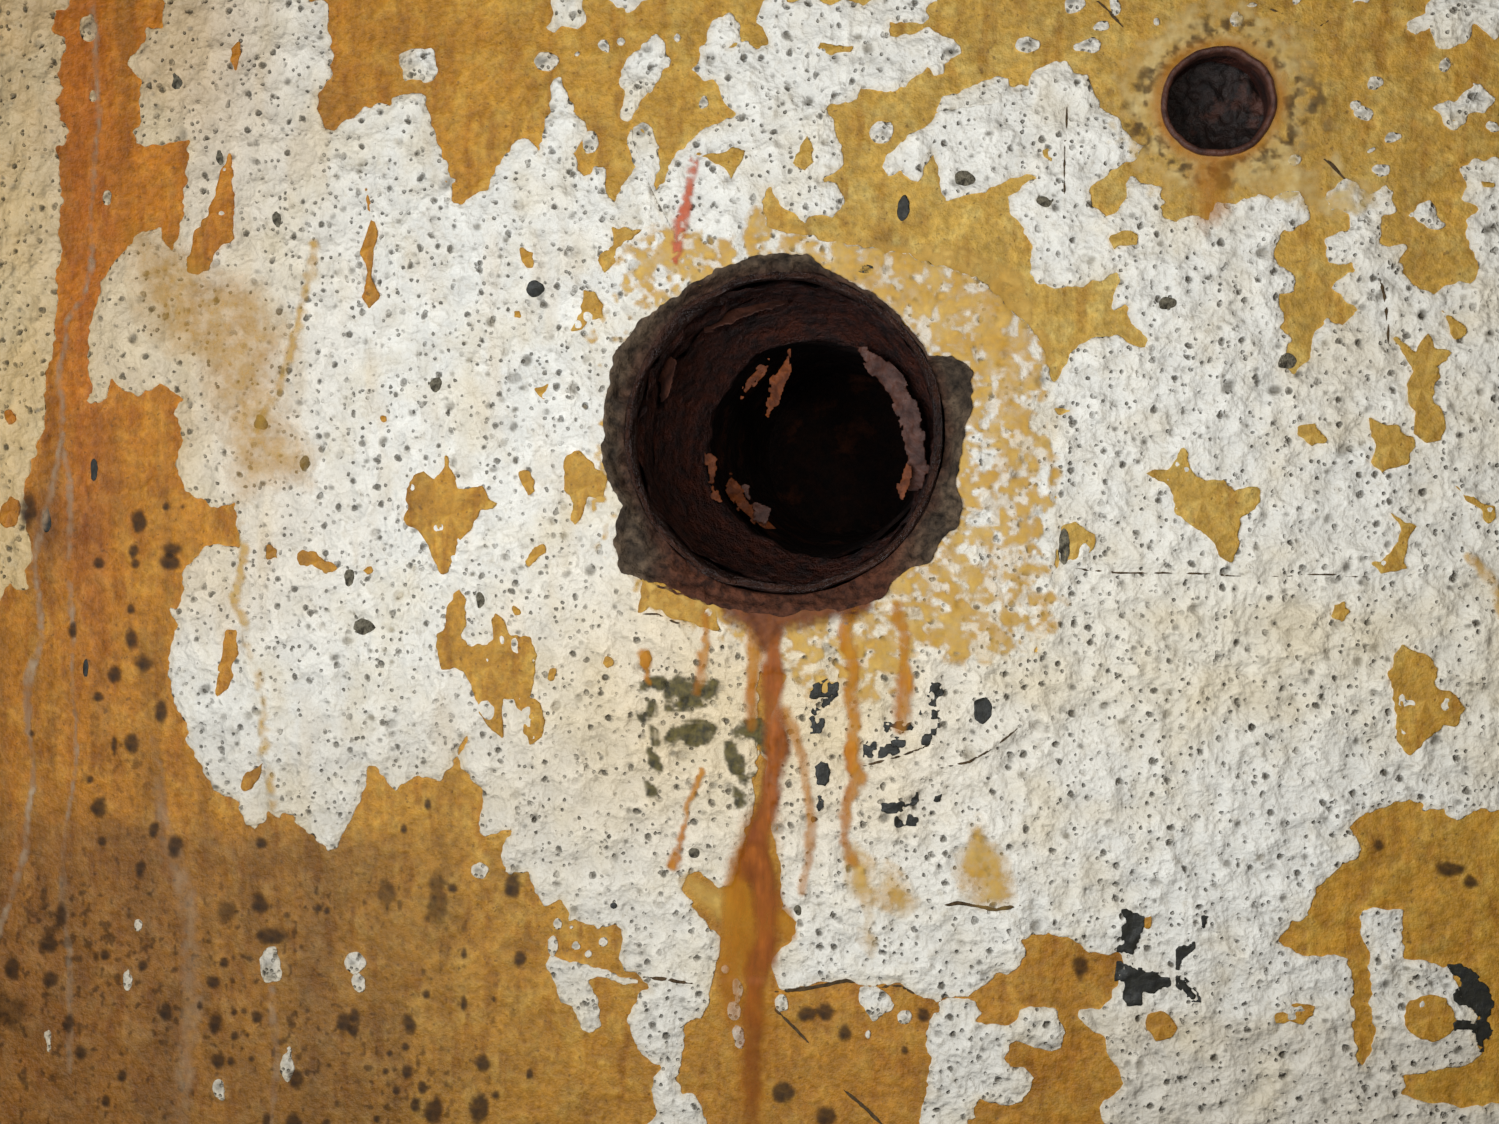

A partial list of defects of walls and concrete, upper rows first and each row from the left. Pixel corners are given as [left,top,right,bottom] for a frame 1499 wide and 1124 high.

peeling [0,0,97,600]
corrosion [740,349,792,418]
corrosion [858,346,929,500]
leakage [129,512,145,567]
peeling [87,0,974,1124]
corrosion [705,452,776,529]
peeling [744,0,1499,1124]
leakage [94,632,150,701]
corrosion [892,604,913,731]
corrosion [698,603,871,1099]
leakage [383,1016,441,1123]
leakage [470,1092,498,1122]